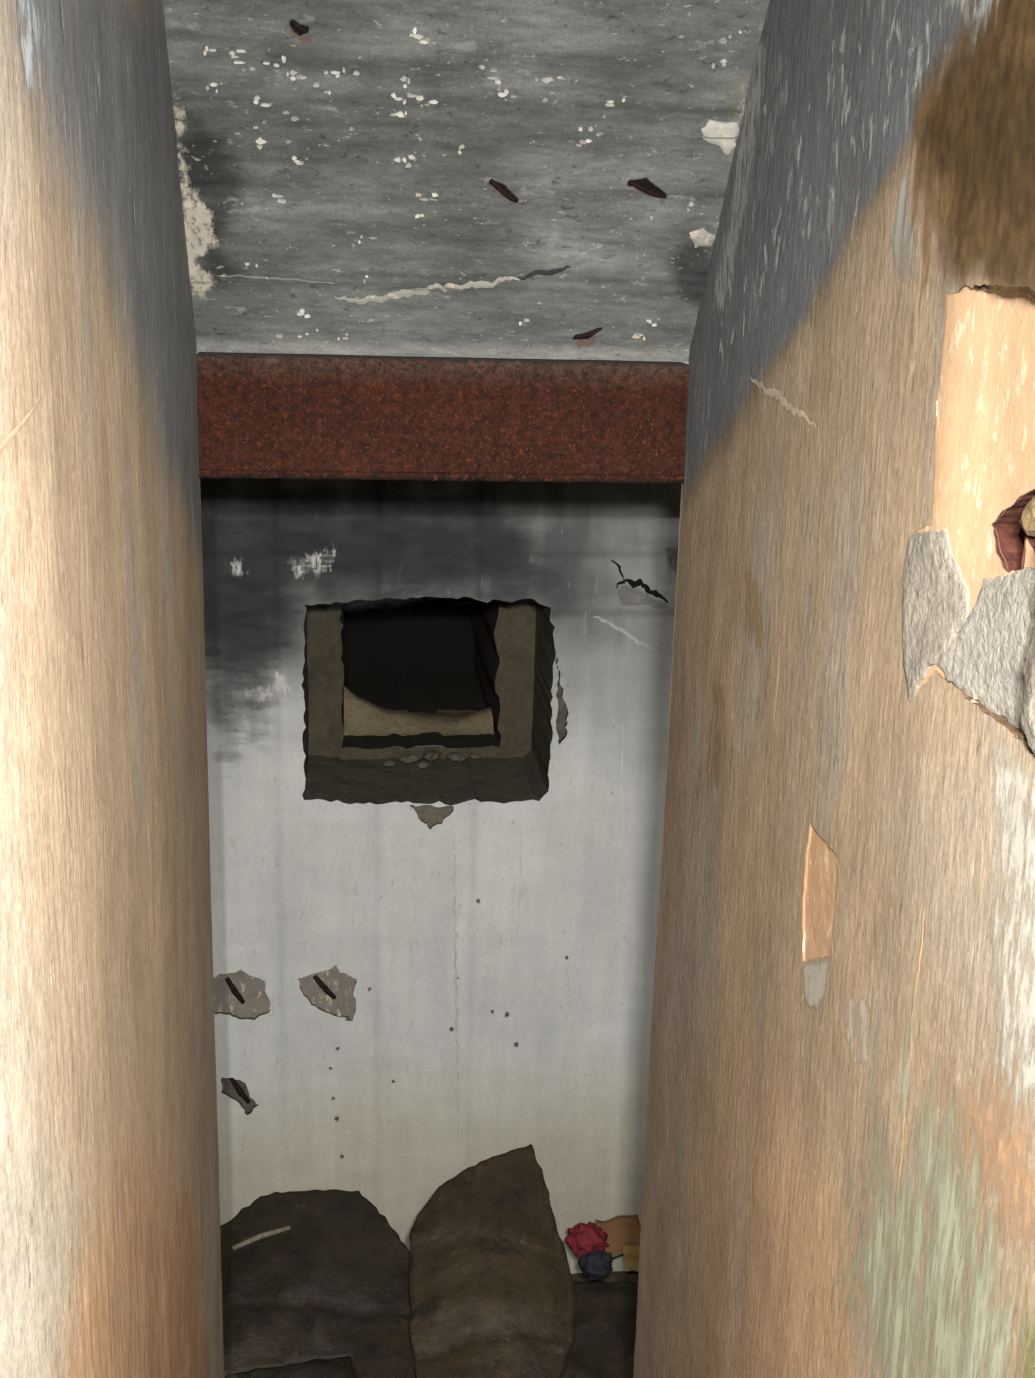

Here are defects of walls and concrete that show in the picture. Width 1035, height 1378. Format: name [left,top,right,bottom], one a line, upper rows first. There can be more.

peeling [173,106,219,301]
crack [610,559,668,608]
spalling [902,284,1035,756]
spalling [802,824,838,961]
spalling [213,970,270,1020]
spalling [298,965,371,1021]